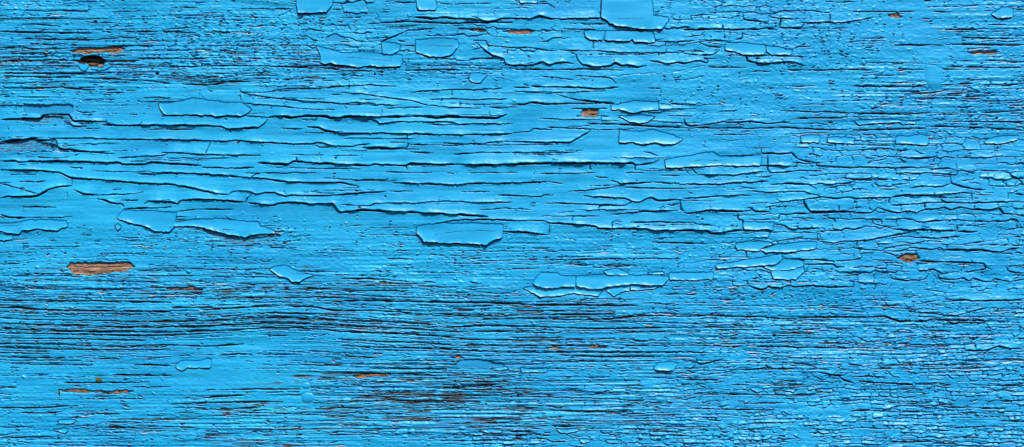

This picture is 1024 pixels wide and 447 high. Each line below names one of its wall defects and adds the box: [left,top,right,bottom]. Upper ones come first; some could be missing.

peeling [73,47,124,71]
peeling [581,109,598,117]
crack [0,0,1024,282]
peeling [67,262,134,276]
peeling [897,254,919,263]
crack [0,258,1024,445]